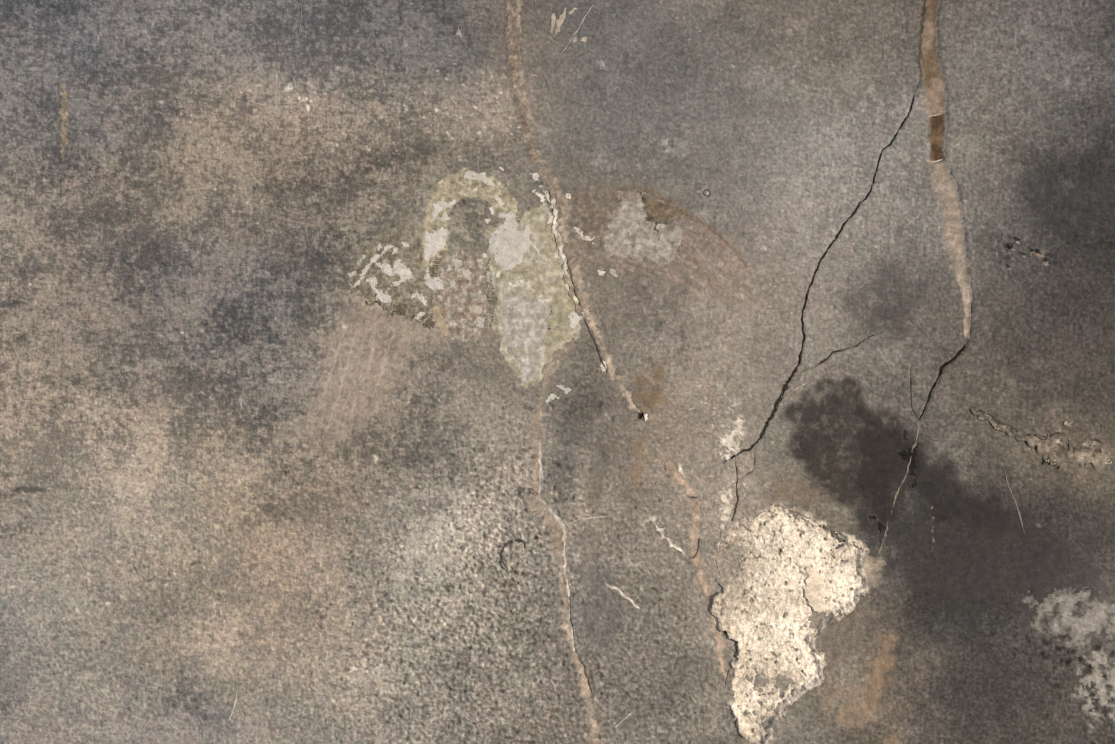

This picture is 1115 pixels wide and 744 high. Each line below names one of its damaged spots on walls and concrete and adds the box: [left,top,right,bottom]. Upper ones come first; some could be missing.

peeling [346,199,472,321]
peeling [463,166,540,288]
peeling [528,172,556,224]
peeling [545,384,576,404]
crack [501,0,640,744]
peeling [567,310,584,329]
peeling [573,227,595,245]
peeling [596,268,618,278]
crack [723,0,973,556]
crack [644,447,732,688]
spalling [709,502,887,744]
water stain [776,374,1115,642]